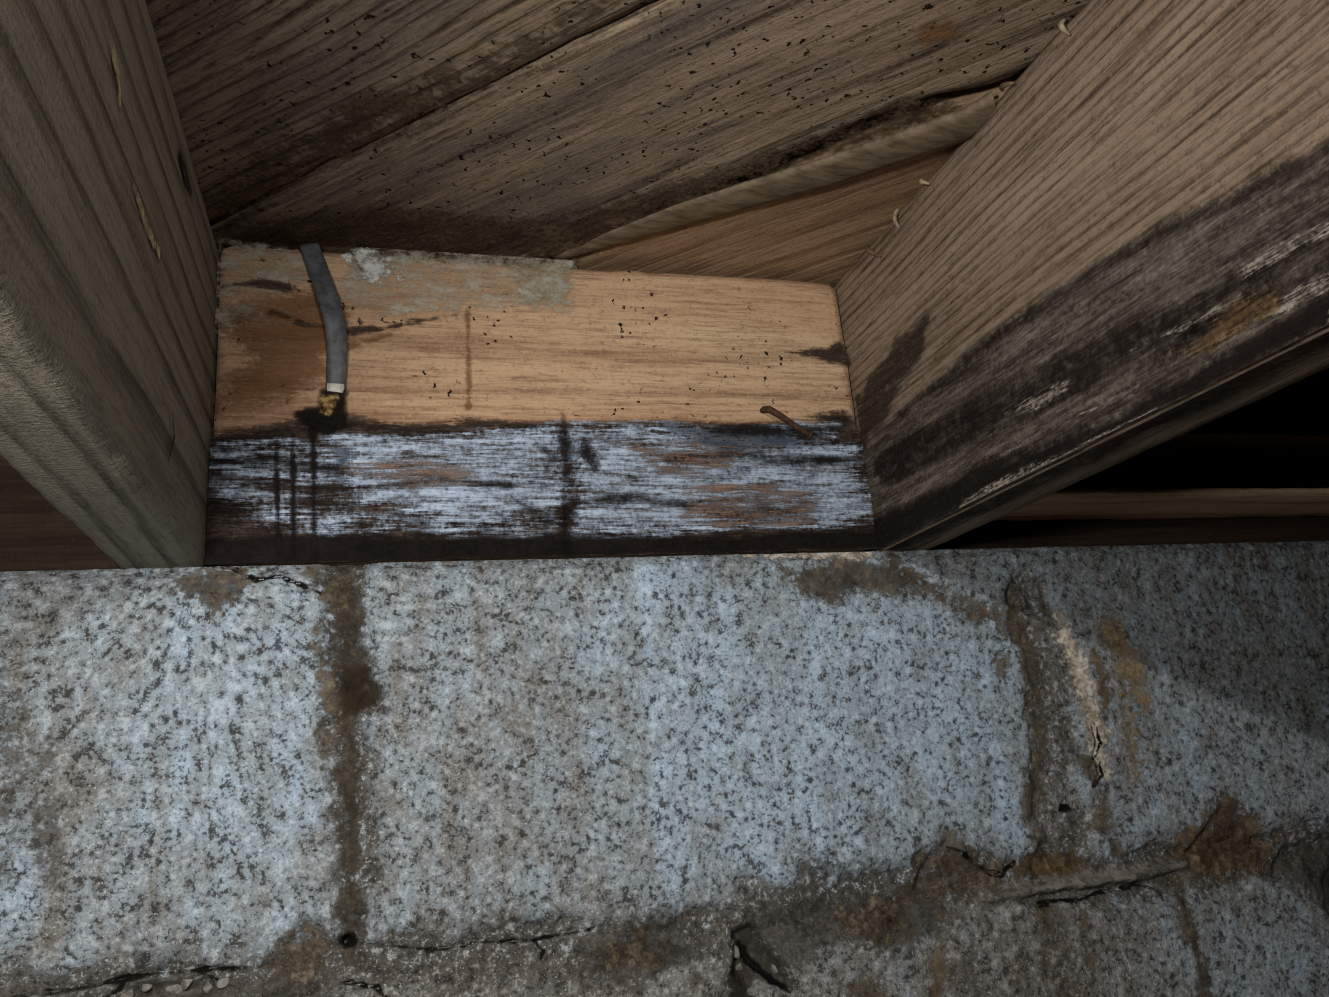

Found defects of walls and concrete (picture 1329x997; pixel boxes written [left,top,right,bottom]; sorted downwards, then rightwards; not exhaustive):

leakage [203,0,955,260]
leakage [153,141,1329,997]
crack [947,846,1016,878]
crack [1036,883,1166,907]